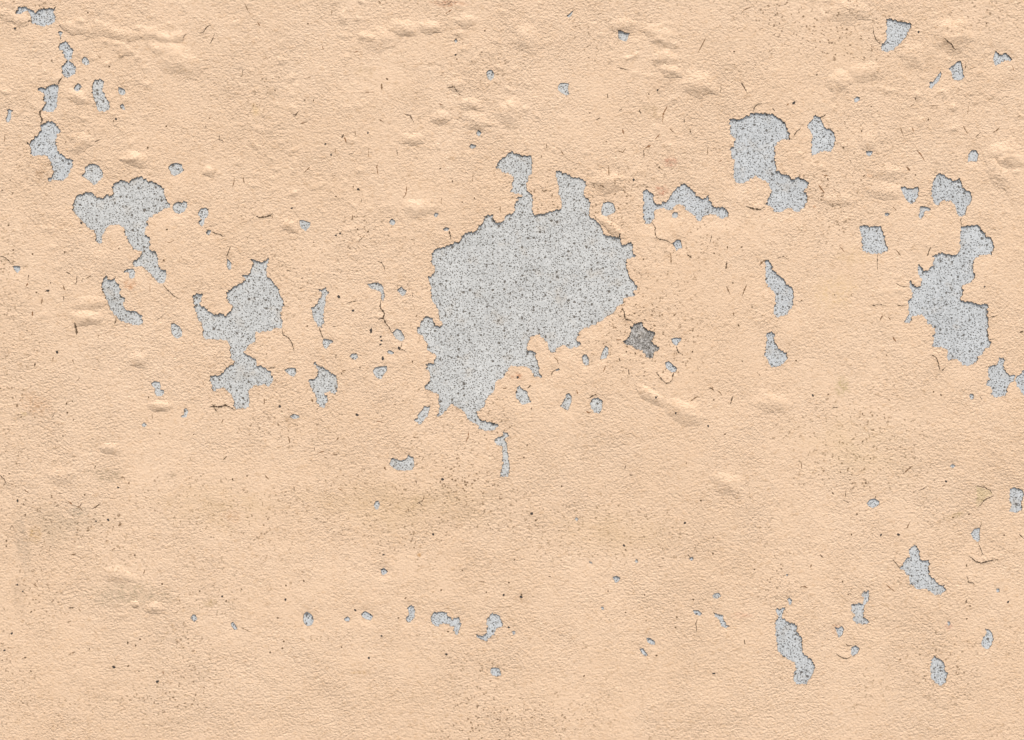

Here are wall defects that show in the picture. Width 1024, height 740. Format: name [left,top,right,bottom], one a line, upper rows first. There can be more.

peeling [16,7,211,325]
peeling [642,183,728,224]
peeling [729,113,809,212]
peeling [807,115,836,155]
peeling [193,258,284,409]
peeling [414,151,637,477]
peeling [623,322,659,359]
peeling [765,260,794,318]
peeling [901,173,994,366]
peeling [986,357,1024,398]
peeling [900,545,946,595]
peeling [774,598,815,685]